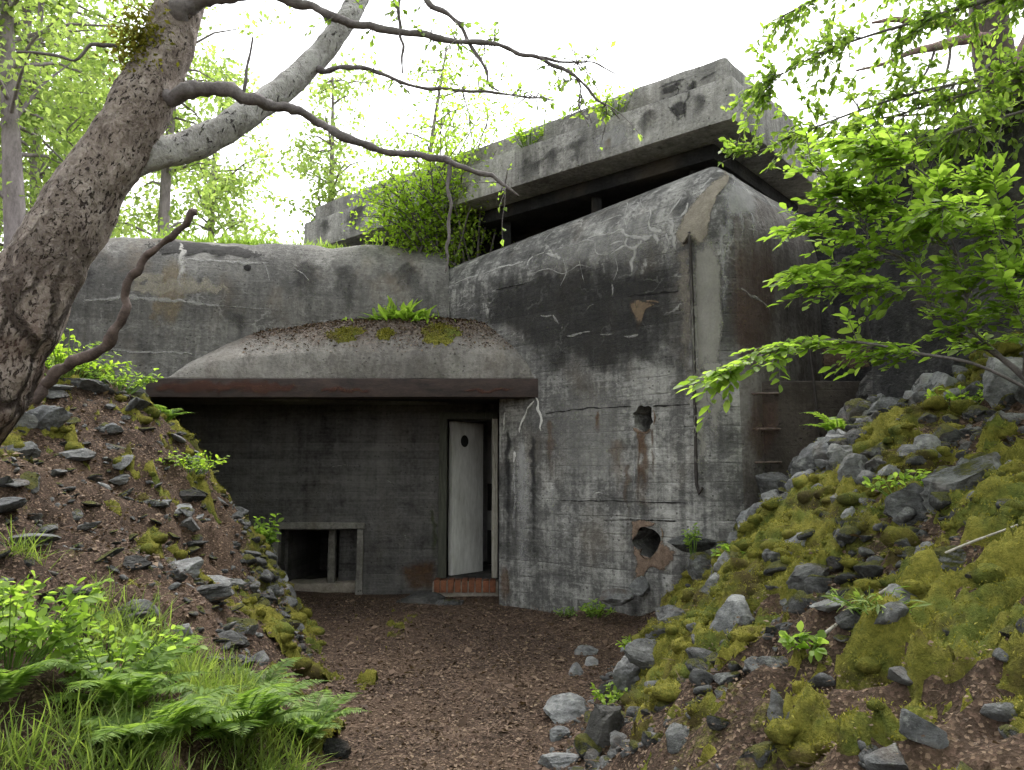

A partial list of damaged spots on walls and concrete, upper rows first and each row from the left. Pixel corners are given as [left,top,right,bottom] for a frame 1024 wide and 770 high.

crack [455,196,688,296]
damp [489,252,691,368]
spalling [630,300,659,322]
peeling [676,171,729,461]
damp [503,398,543,522]
rust [637,432,653,480]
spalling [631,520,675,578]